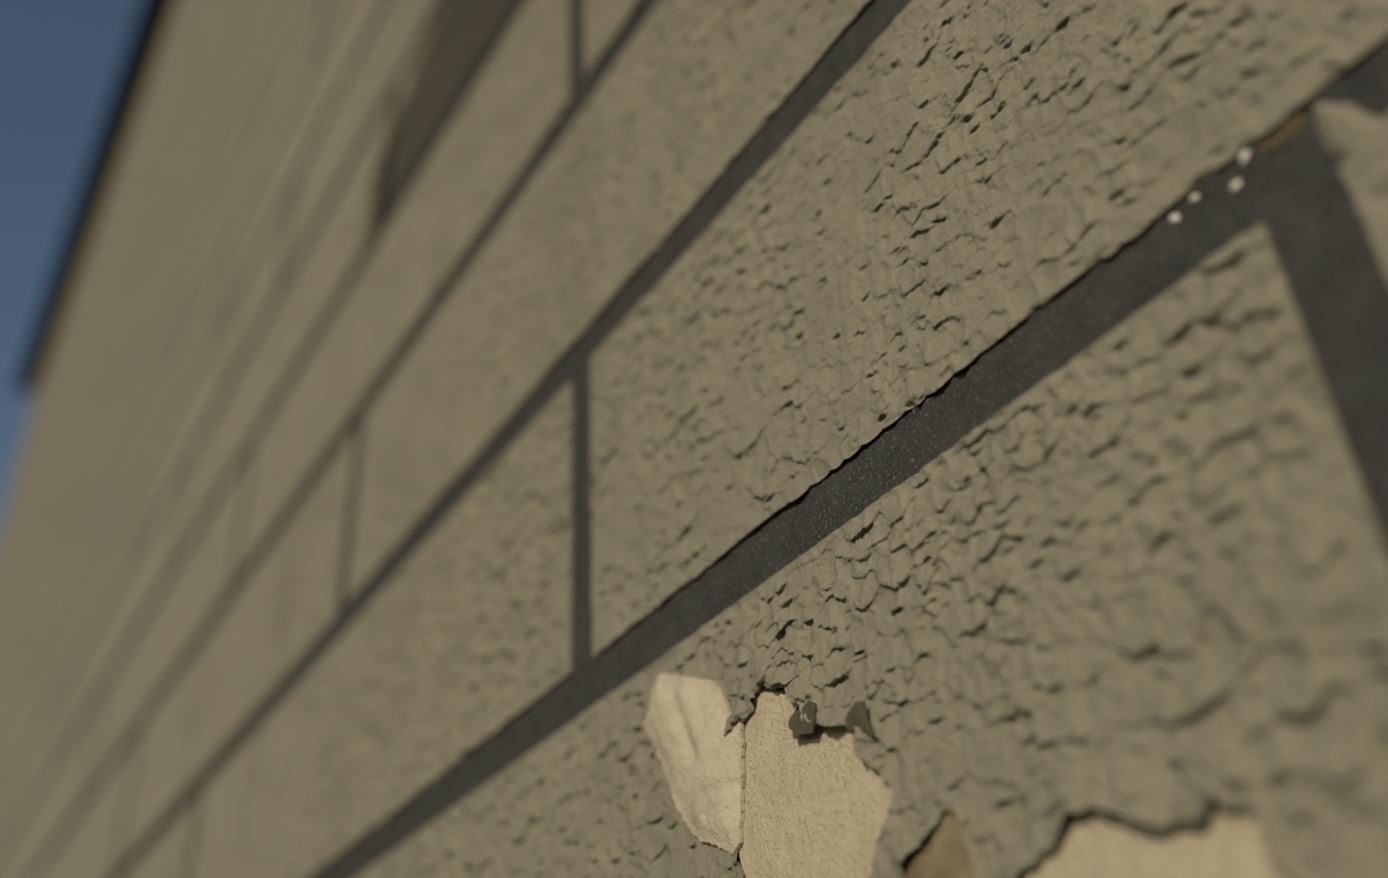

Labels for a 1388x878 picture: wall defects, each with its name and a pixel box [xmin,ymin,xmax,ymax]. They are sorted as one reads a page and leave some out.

peeling [644,672,893,878]
peeling [904,810,974,878]
peeling [1021,803,1287,878]